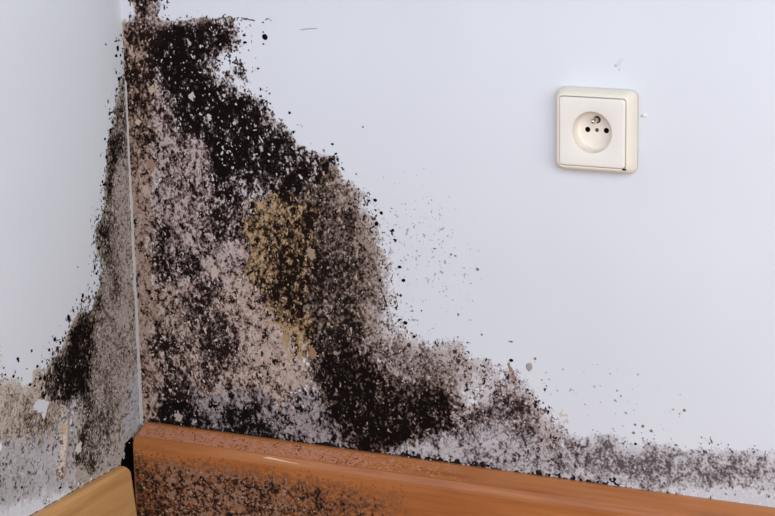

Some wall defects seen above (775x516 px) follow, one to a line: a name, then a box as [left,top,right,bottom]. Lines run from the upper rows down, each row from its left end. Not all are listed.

mould [134,445,413,516]